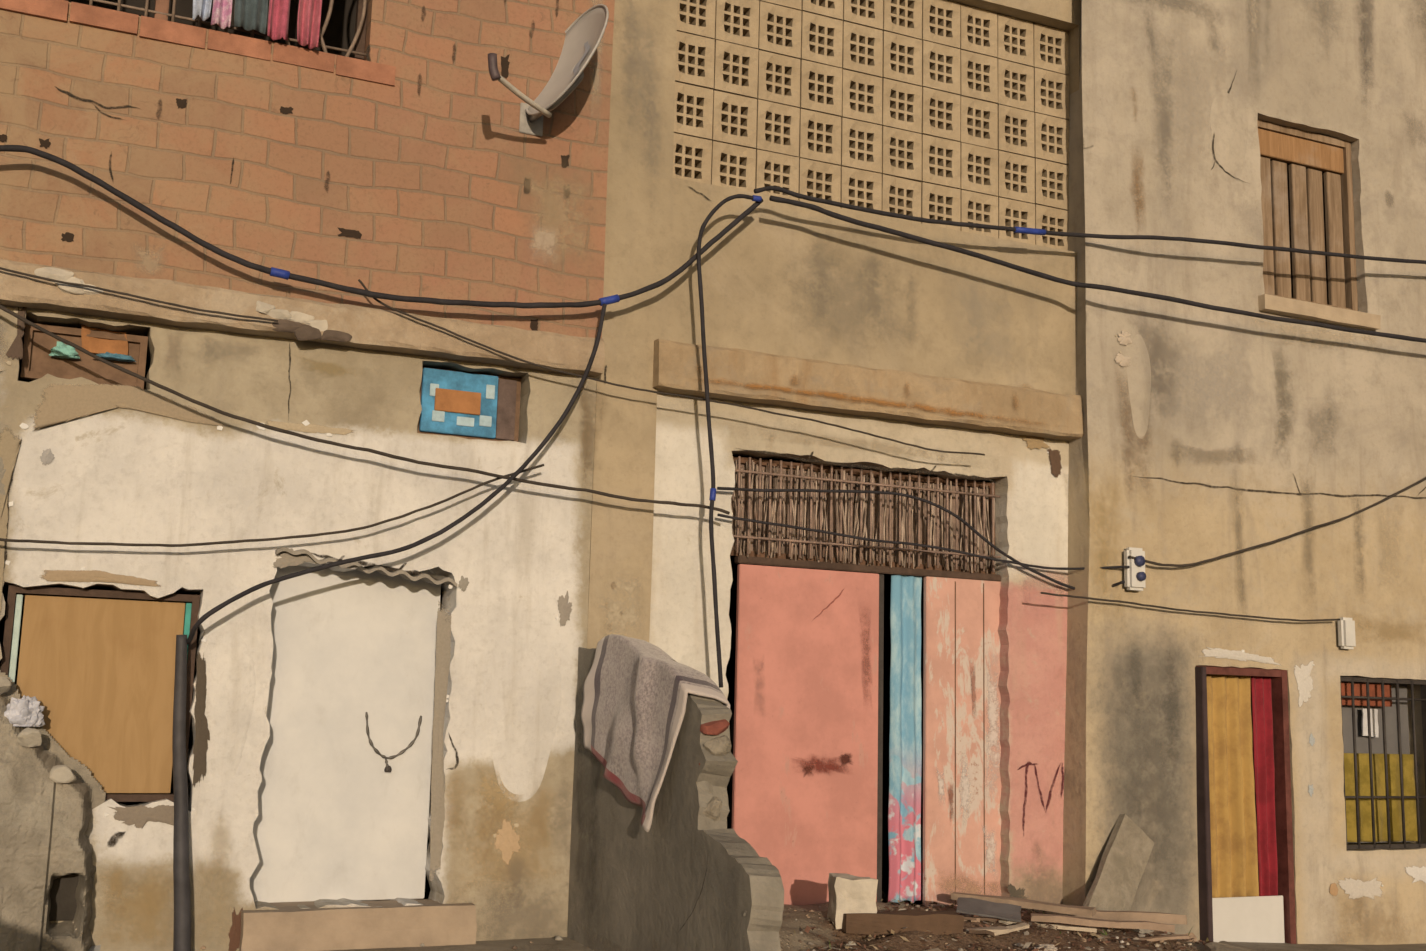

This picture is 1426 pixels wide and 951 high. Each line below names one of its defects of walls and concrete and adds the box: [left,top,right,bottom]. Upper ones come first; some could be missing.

spalling [256,301,352,342]
peeling [0,384,225,611]
peeling [481,776,521,865]
flaking render [1330,878,1383,900]